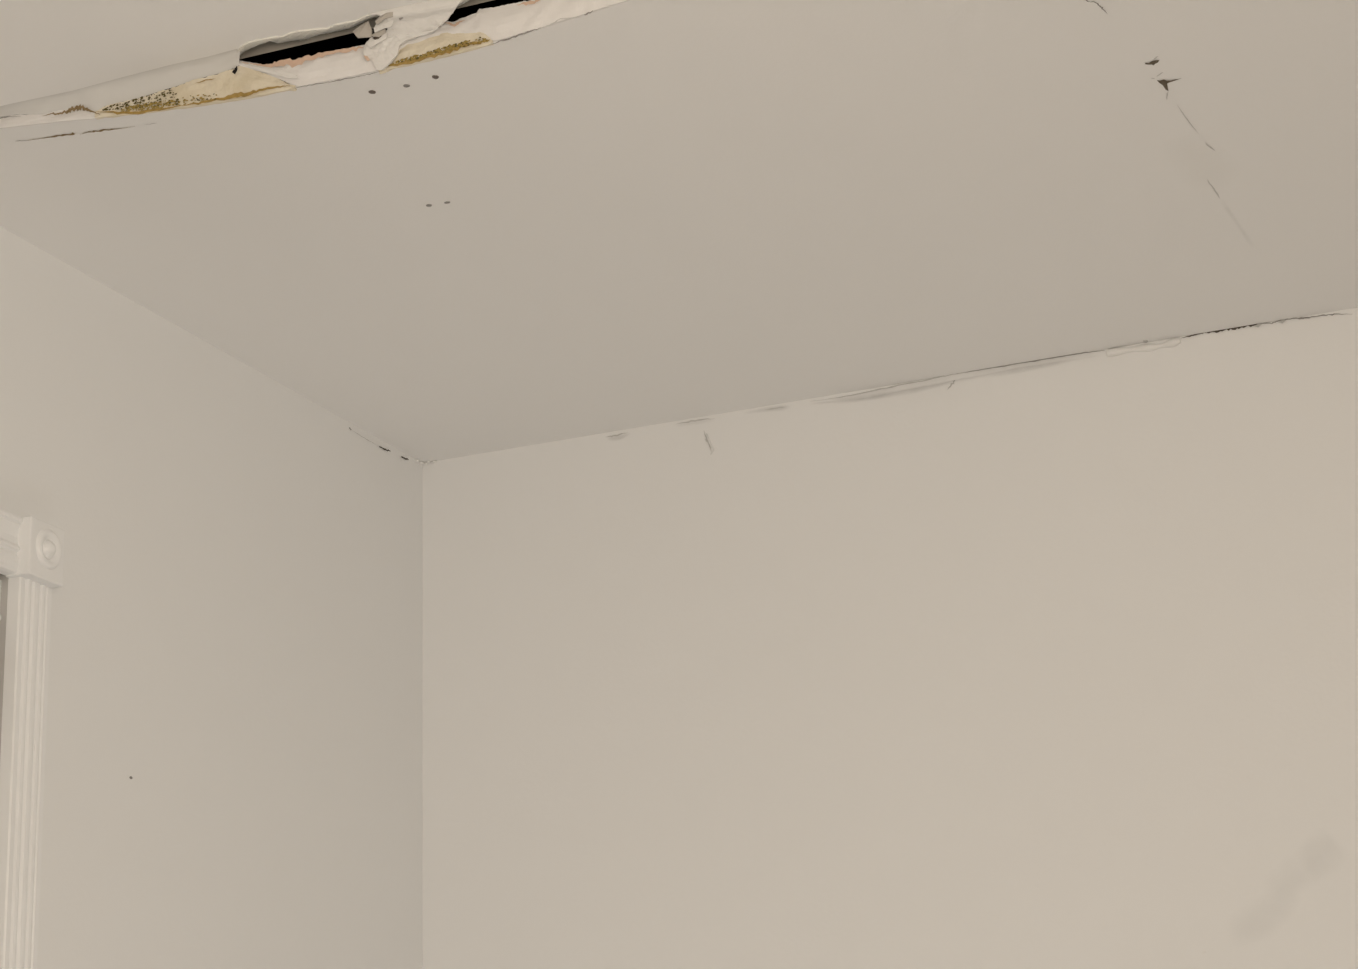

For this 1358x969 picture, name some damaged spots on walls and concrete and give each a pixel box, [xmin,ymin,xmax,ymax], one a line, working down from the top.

spalling [237,12,403,61]
crack [1179,108,1220,198]
crack [1183,313,1343,338]